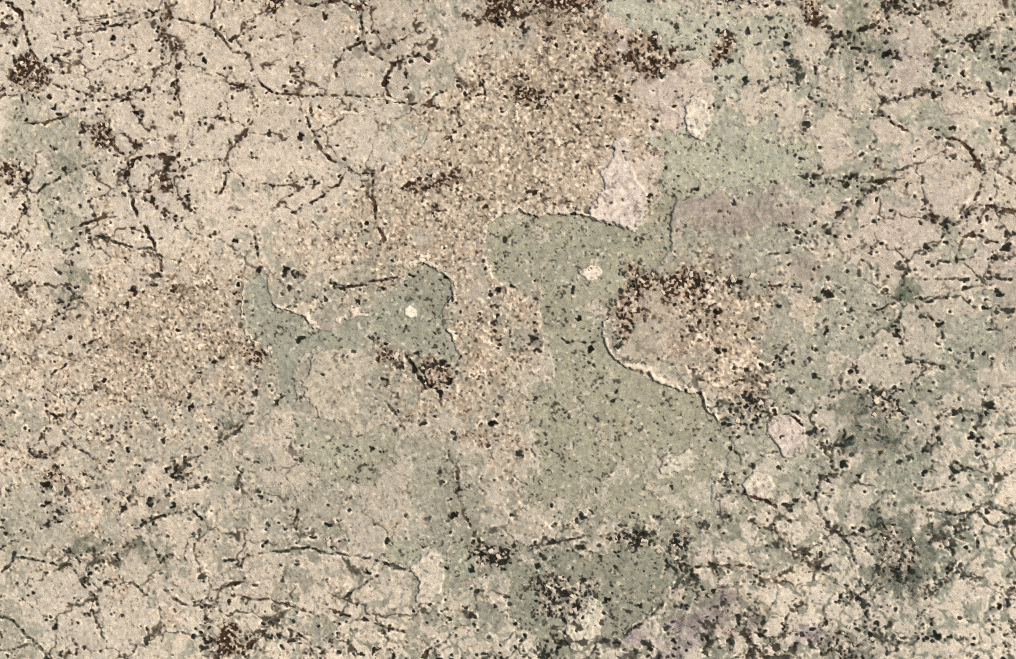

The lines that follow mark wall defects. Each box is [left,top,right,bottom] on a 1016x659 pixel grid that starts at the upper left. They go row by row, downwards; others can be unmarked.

crack [0,0,444,242]
crack [37,145,181,272]
crack [876,111,1016,339]
crack [329,276,398,290]
peeling [240,258,461,494]
crack [405,351,458,405]
peeling [385,99,822,659]
crack [1,556,99,606]
crack [132,546,406,659]
crack [617,563,755,644]
crack [822,517,882,565]
crack [924,486,1002,578]